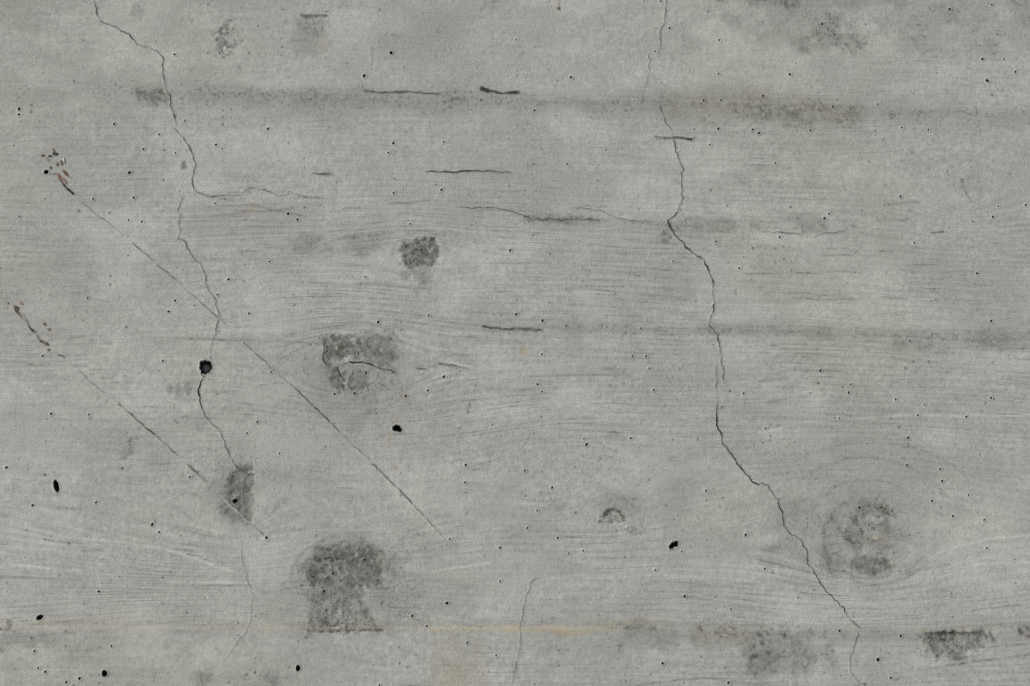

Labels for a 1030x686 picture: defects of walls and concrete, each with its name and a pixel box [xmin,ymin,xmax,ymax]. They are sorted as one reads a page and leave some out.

crack [362,88,442,96]
crack [424,168,513,176]
crack [92,0,335,485]
crack [929,228,945,236]
crack [321,343,470,392]
crack [455,0,871,686]
crack [225,540,255,658]